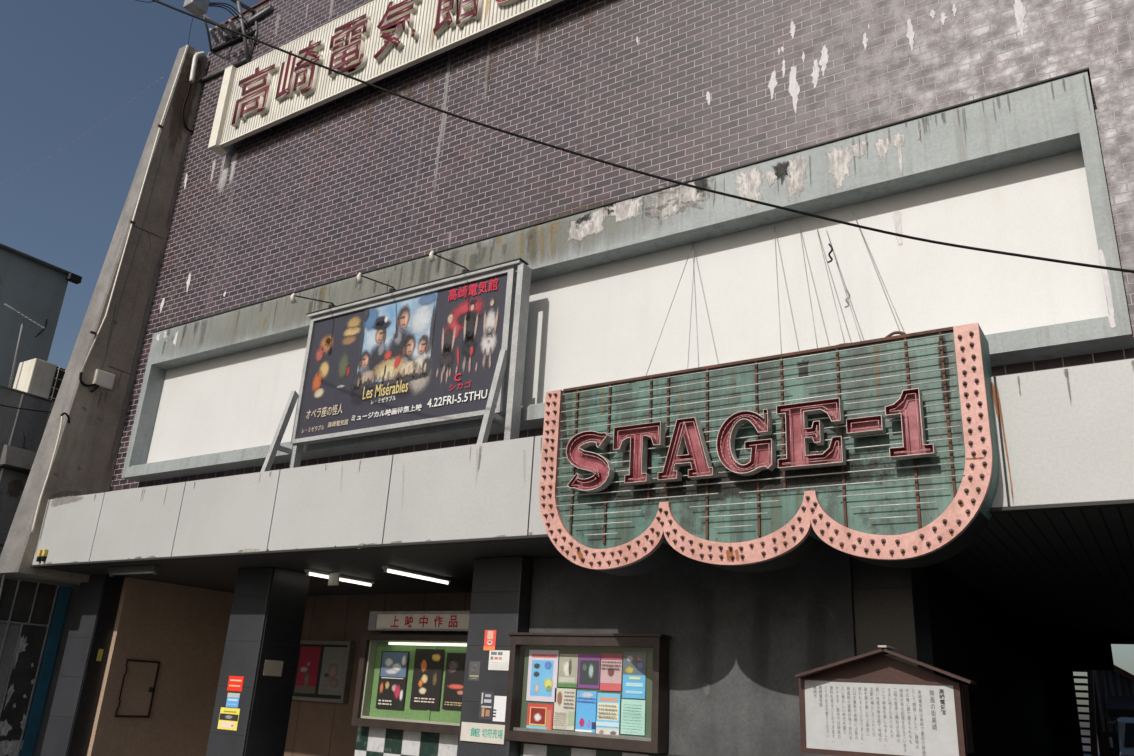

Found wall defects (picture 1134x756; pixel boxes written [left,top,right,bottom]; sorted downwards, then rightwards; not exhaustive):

peeling [1013,0,1026,37]
peeling [768,21,829,113]
peeling [567,174,714,242]
peeling [732,153,807,210]
peeling [825,129,921,190]